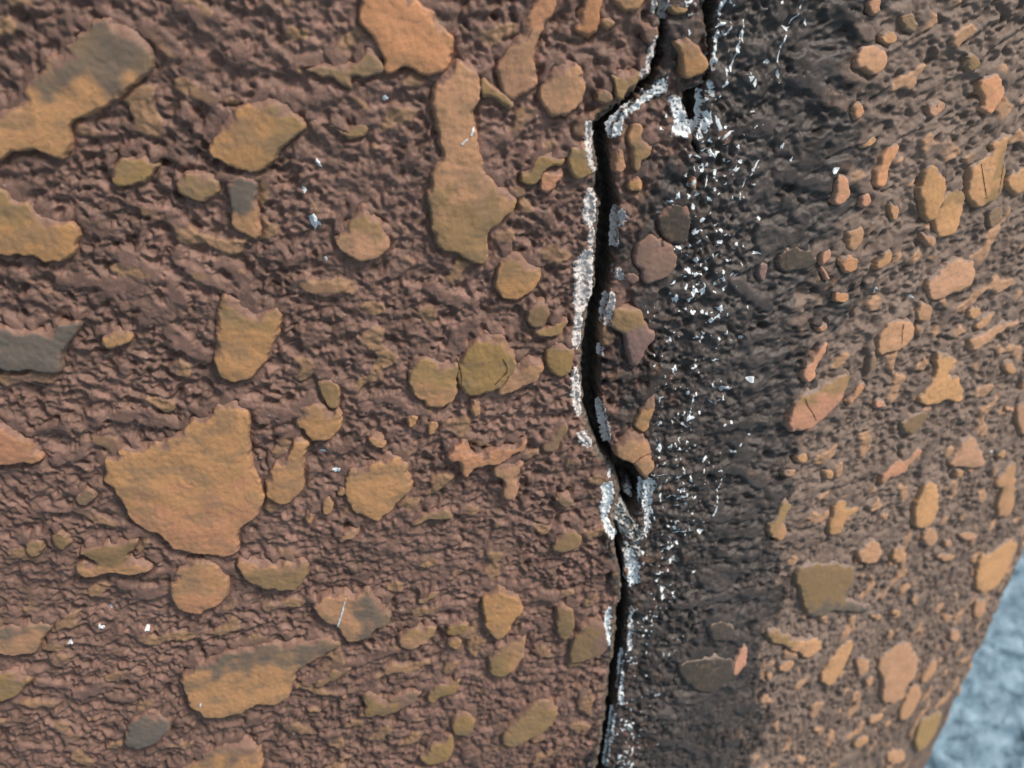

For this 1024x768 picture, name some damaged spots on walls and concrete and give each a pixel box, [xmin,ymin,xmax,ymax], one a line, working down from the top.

crack [569,0,671,768]
crack [681,1,722,152]
damp [579,0,894,768]